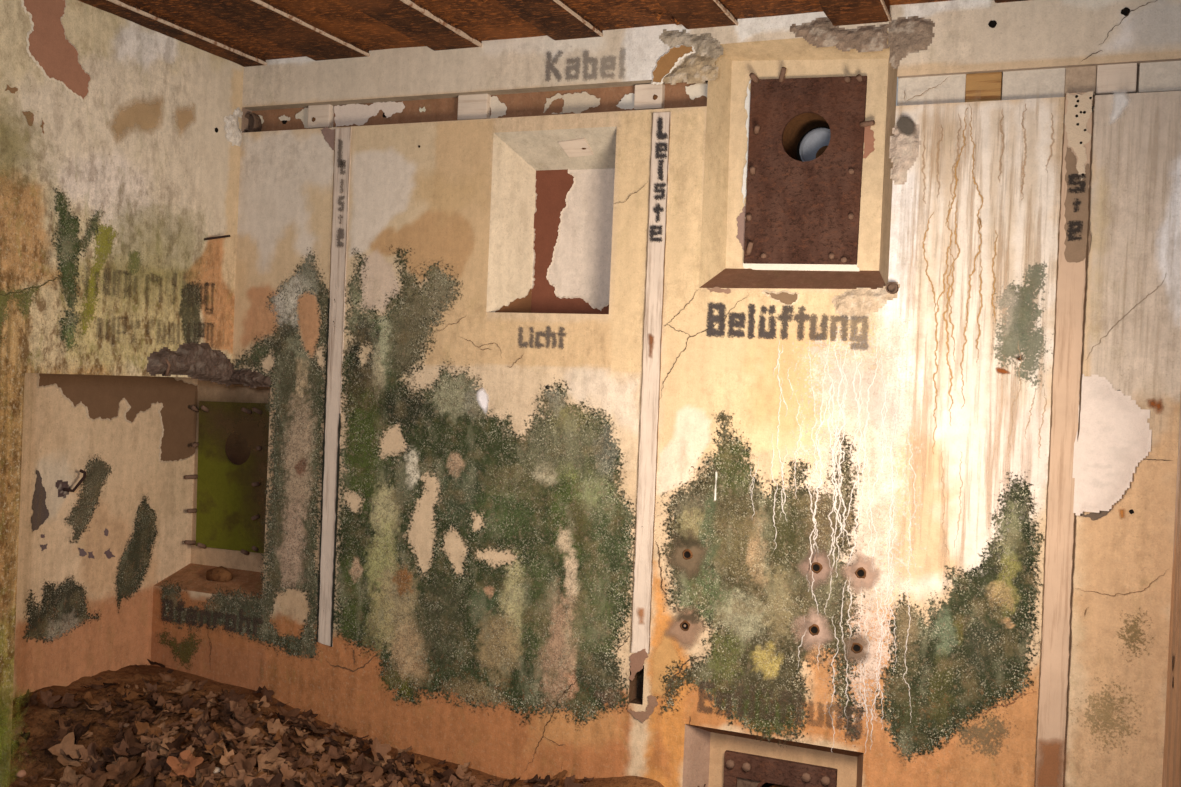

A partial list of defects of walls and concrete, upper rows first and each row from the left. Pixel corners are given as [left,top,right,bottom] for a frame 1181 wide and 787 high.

peeling [21,0,91,102]
peeling [22,111,44,133]
peeling [490,96,507,118]
leakage [896,116,915,135]
peeling [495,169,609,314]
peeling [37,341,272,463]
leakage [477,389,488,411]
leakage [1008,341,1047,458]
leakage [750,328,916,750]